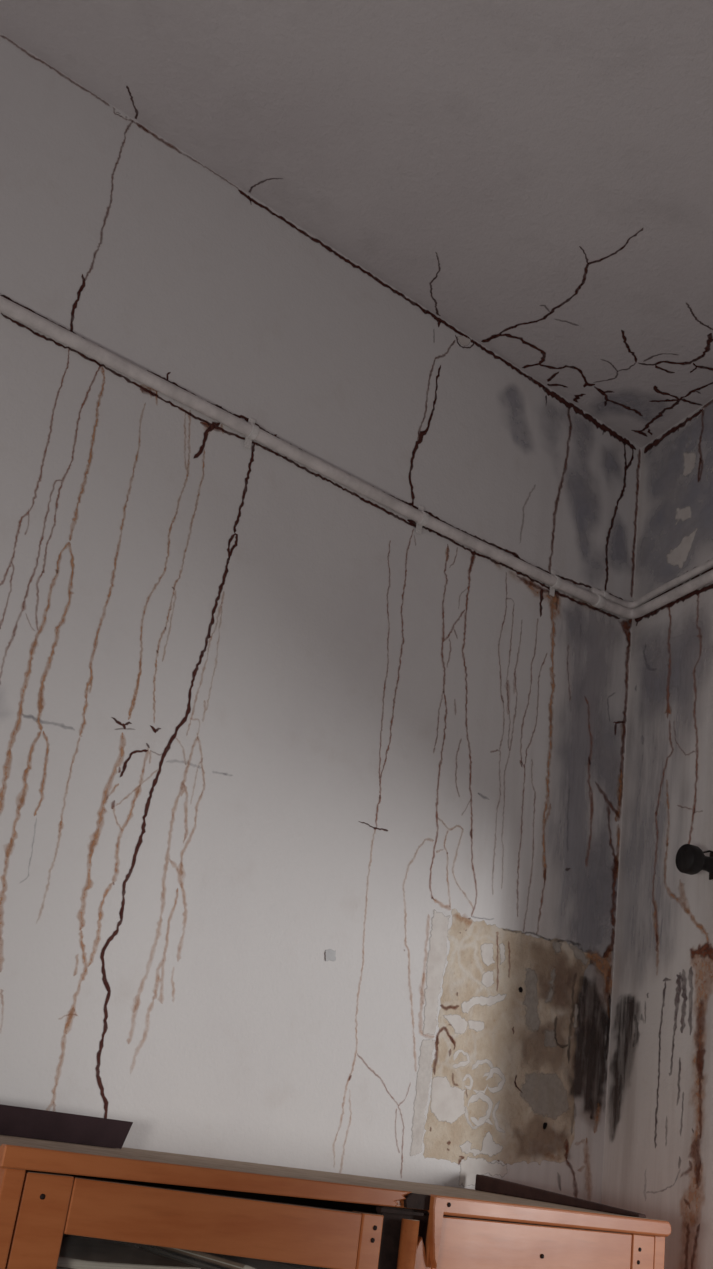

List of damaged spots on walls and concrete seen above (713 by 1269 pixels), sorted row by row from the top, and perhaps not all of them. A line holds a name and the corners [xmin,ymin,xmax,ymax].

crack [0,35,713,597]
crack [96,442,255,1118]
rust [0,295,713,992]
damp [556,612,664,949]
damp [612,399,713,582]
flaking render [410,909,591,1186]
damp [555,978,648,1139]
damp [654,967,693,1148]
rust [684,925,713,1269]